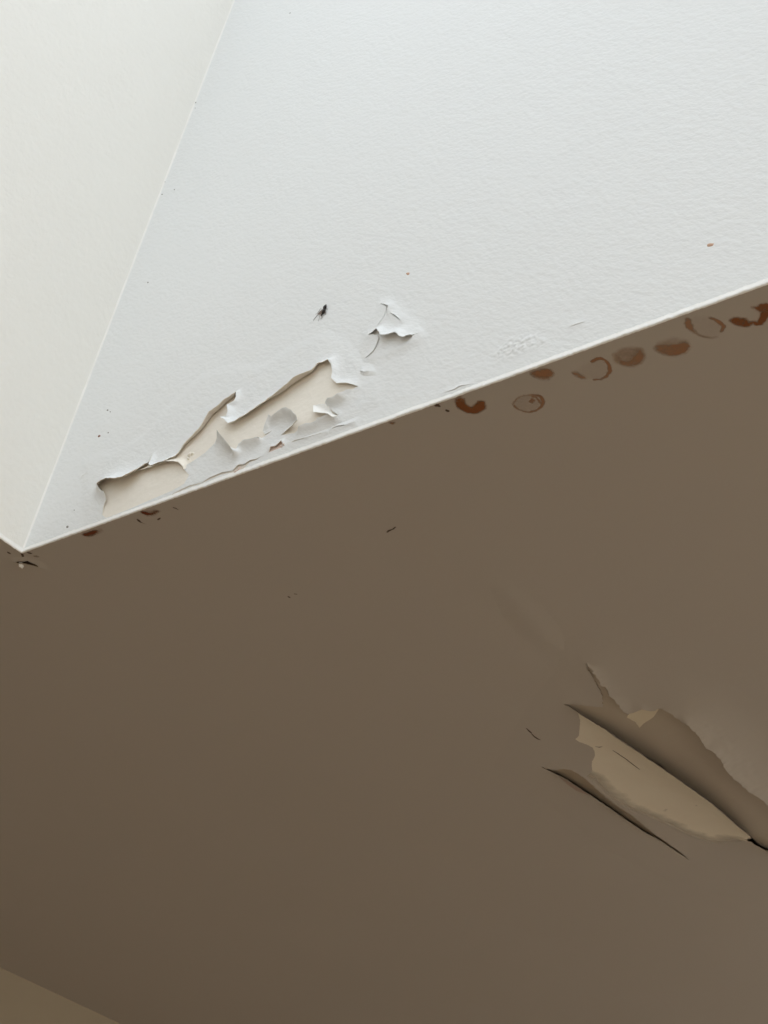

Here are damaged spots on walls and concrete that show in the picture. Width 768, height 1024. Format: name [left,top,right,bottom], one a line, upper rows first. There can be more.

rust [710,303,768,332]
rust [655,318,703,356]
rust [531,369,554,379]
rust [573,350,644,381]
peeling [80,295,431,526]
rust [455,398,485,414]
peeling [493,629,768,912]